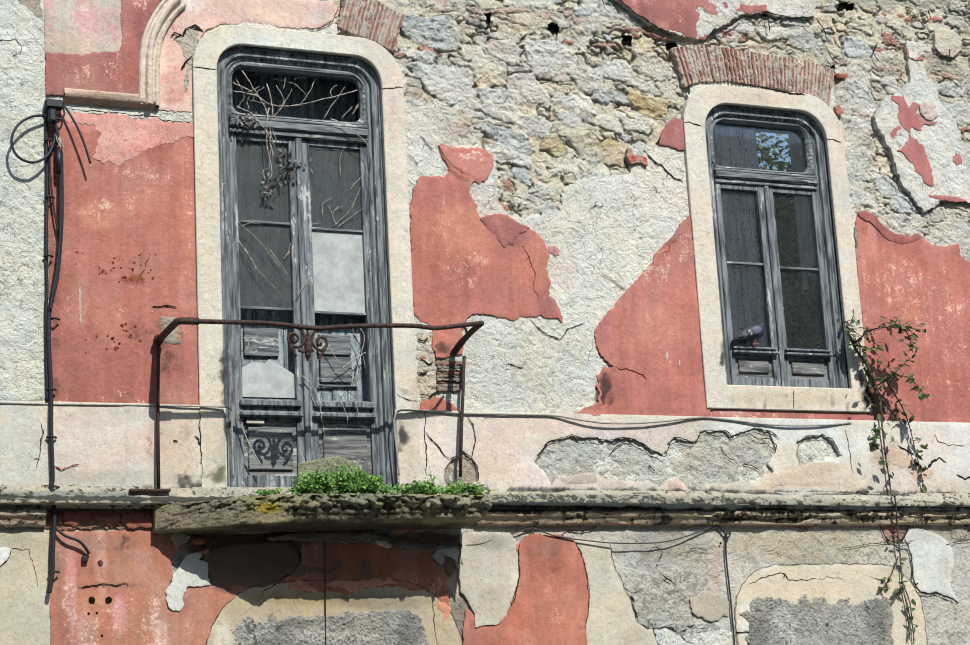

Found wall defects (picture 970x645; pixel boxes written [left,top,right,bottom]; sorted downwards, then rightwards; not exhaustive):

peeling [18,0,162,96]
crack [602,0,679,37]
peeling [48,0,349,405]
spalling [379,0,970,493]
damp [677,490,740,510]
damp [788,489,917,511]
peeling [49,511,252,645]
peeling [267,530,733,645]
crack [750,572,890,589]
peeling [880,525,970,603]